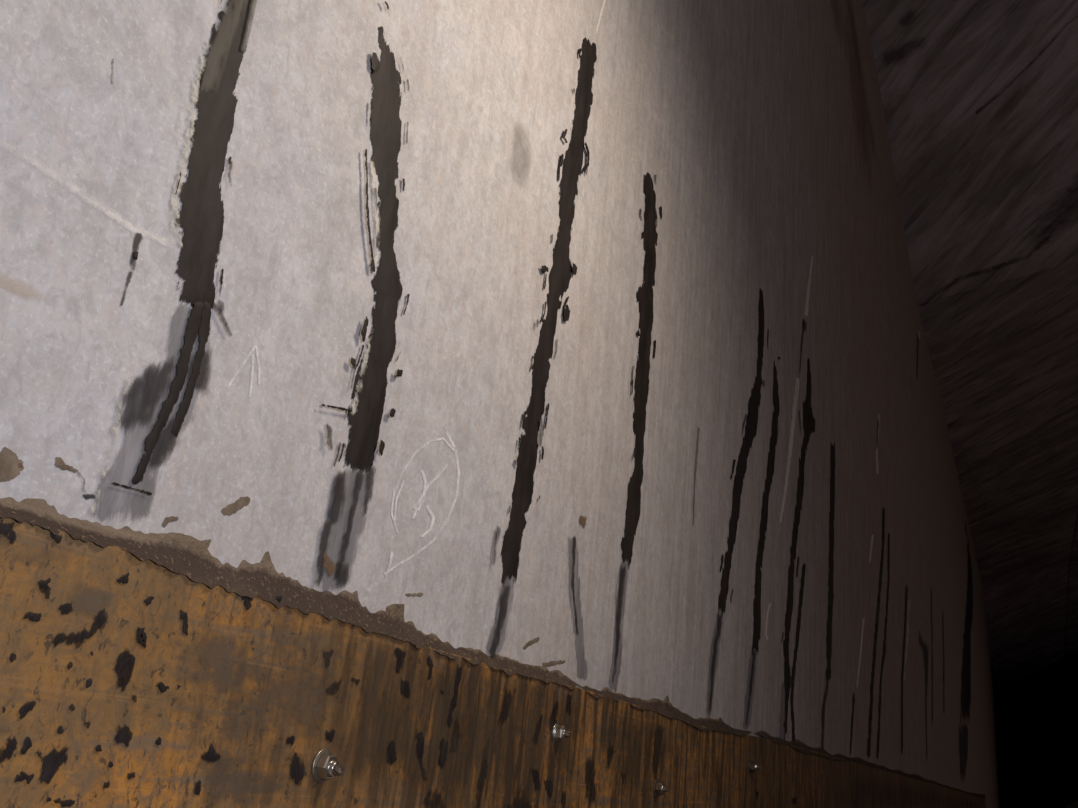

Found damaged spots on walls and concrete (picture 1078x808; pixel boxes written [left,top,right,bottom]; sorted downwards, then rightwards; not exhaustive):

peeling [0,447,24,482]
peeling [55,457,96,499]
peeling [221,496,250,516]
peeling [39,578,51,599]
peeling [24,612,42,622]
peeling [59,603,73,614]
peeling [180,610,188,635]
peeling [137,627,147,649]
peeling [395,648,406,673]
peeling [20,701,36,718]